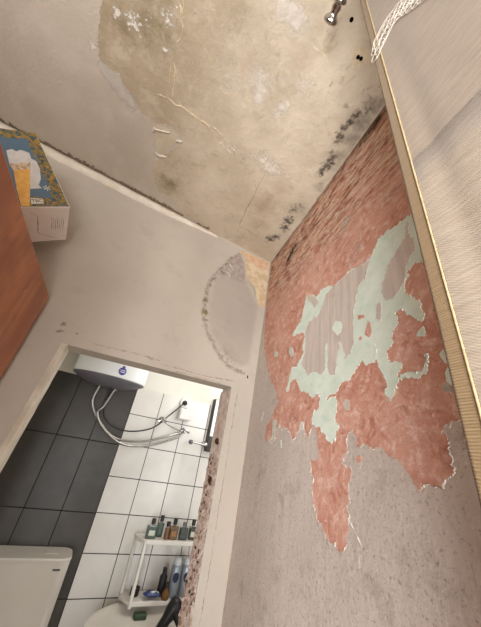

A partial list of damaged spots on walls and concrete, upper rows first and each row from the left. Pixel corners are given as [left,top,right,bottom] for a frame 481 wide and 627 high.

crack [155,64,240,158]
peeling [96,0,460,556]
flaking render [178,530,203,626]